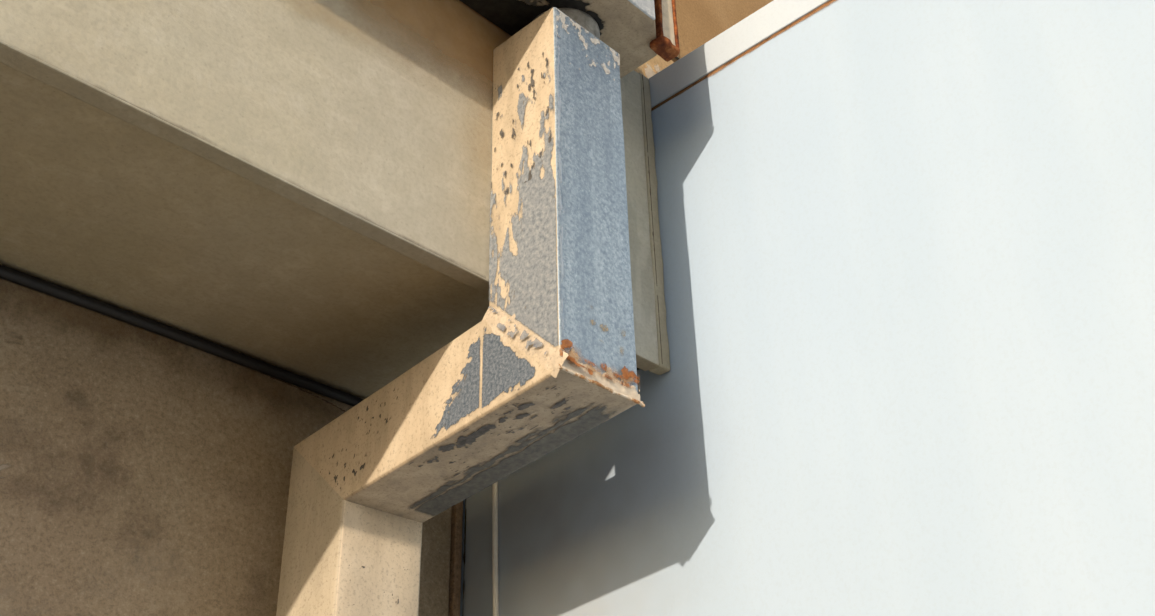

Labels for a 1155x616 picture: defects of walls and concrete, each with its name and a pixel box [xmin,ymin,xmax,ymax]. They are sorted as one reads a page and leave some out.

peeling [556,8,620,81]
peeling [409,53,640,516]
rust [559,339,639,387]